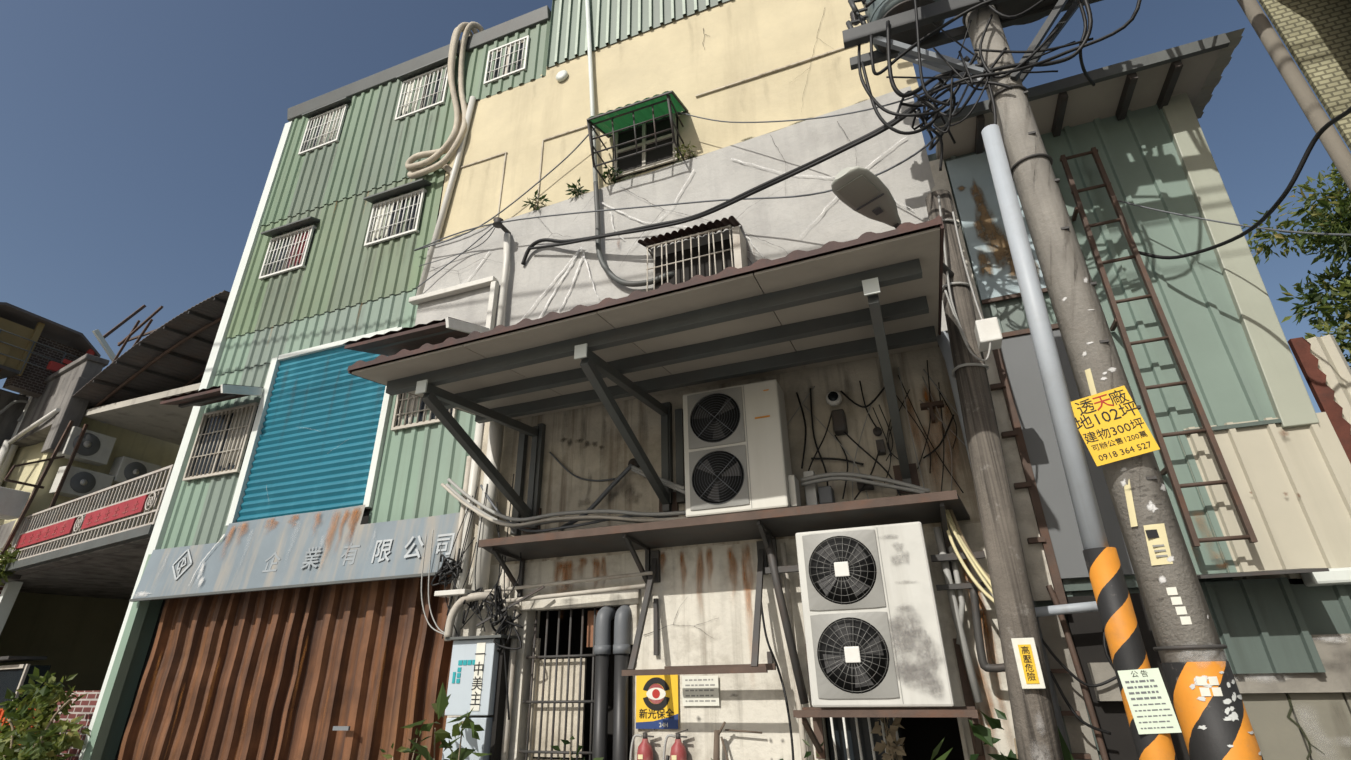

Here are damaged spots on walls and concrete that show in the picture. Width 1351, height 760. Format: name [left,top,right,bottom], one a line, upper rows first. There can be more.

crack [521,121,907,320]
peeling [958,183,1016,277]
peeling [1189,671,1254,734]